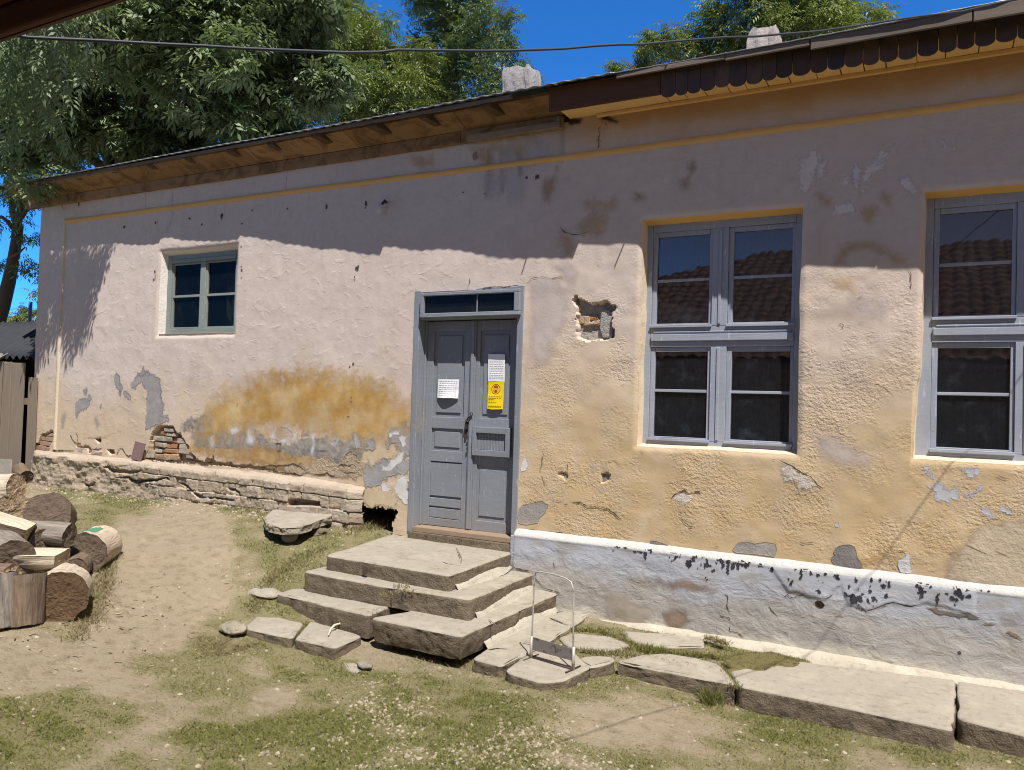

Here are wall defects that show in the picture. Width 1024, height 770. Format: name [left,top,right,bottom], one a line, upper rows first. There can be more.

spalling [579,300,616,340]
spalling [36,388,101,451]
spalling [114,366,196,460]
water stain [181,370,411,472]
peeling [284,422,411,509]
spalling [673,493,694,505]
spalling [781,464,817,491]
peeling [922,465,984,506]
peeling [981,506,1013,519]
peeling [668,552,774,580]
peeling [788,568,891,611]
peeling [898,553,990,606]